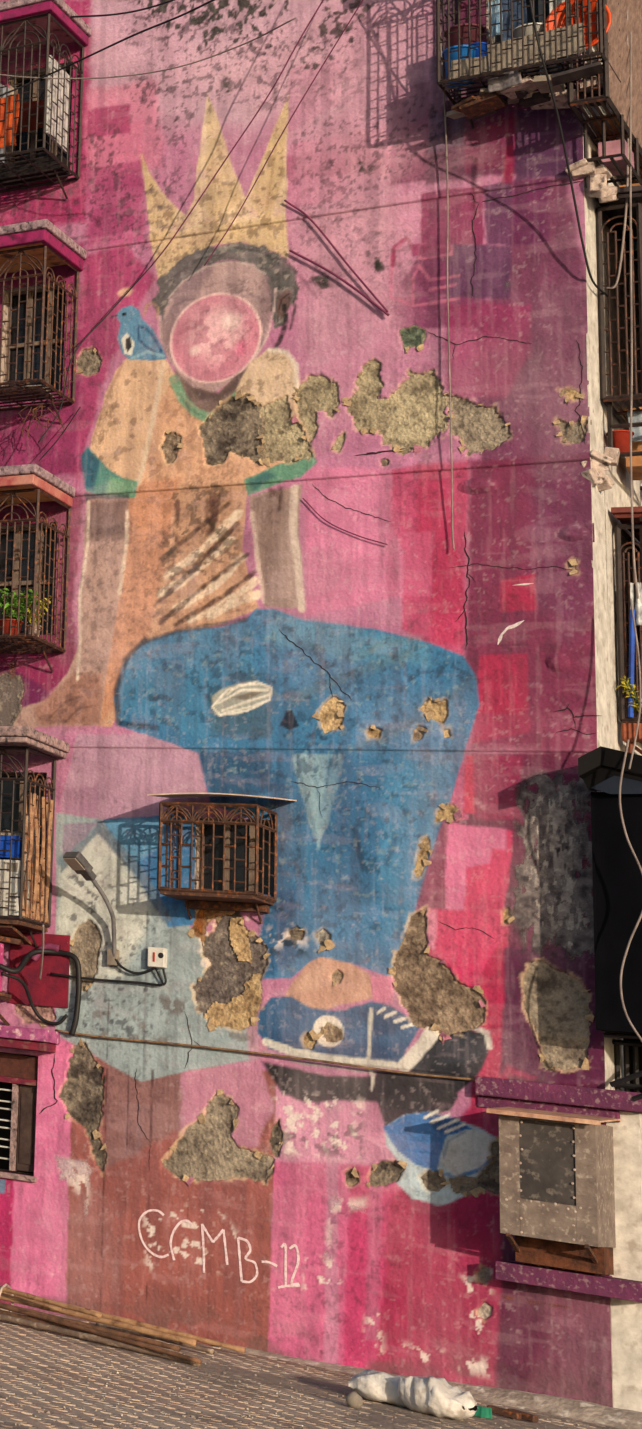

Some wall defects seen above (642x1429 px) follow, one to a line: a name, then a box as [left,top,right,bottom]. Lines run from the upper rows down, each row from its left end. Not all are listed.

flaking render [161,430,183,464]
flaking render [199,360,511,467]
crack [452,533,571,646]
flaking render [312,697,345,733]
flaking render [413,697,450,741]
flaking render [187,909,270,1031]
flaking render [388,909,486,1043]
flaking render [523,961,595,1071]
flaking render [59,1039,107,1171]
flaking render [162,1089,283,1186]
flaking render [345,1160,407,1188]
flaking render [421,1137,500,1198]